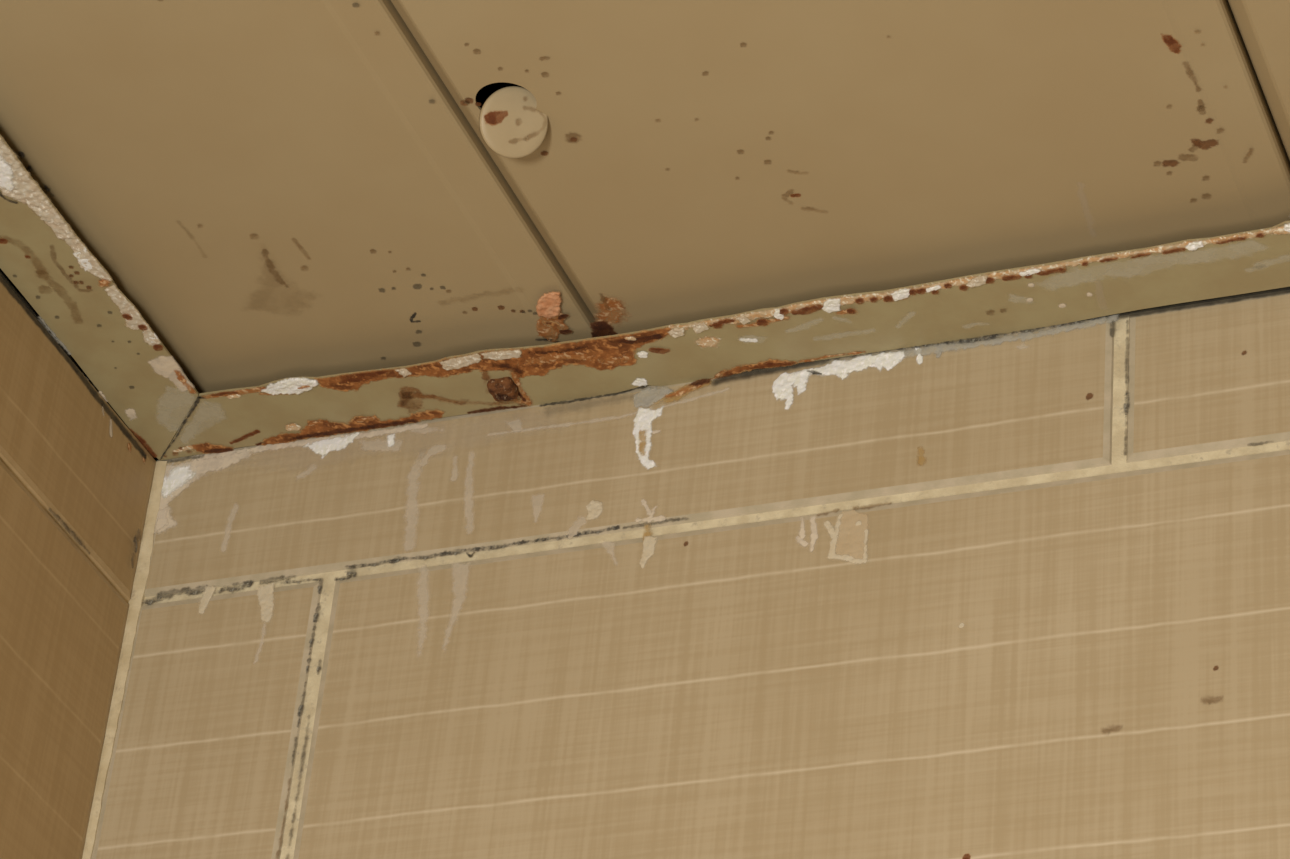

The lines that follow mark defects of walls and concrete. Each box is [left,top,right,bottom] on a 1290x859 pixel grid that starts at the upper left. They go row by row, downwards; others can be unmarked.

rust [1162,35,1181,54]
rust [1192,139,1218,149]
rust [98,311,163,354]
rust [128,229,1274,464]